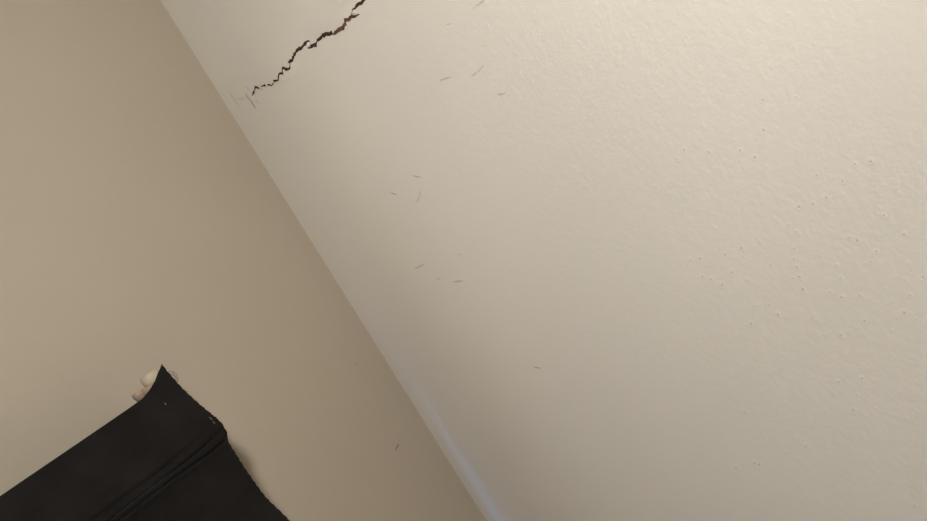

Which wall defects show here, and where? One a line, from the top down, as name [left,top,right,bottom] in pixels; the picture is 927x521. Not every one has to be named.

crack [252,0,365,96]